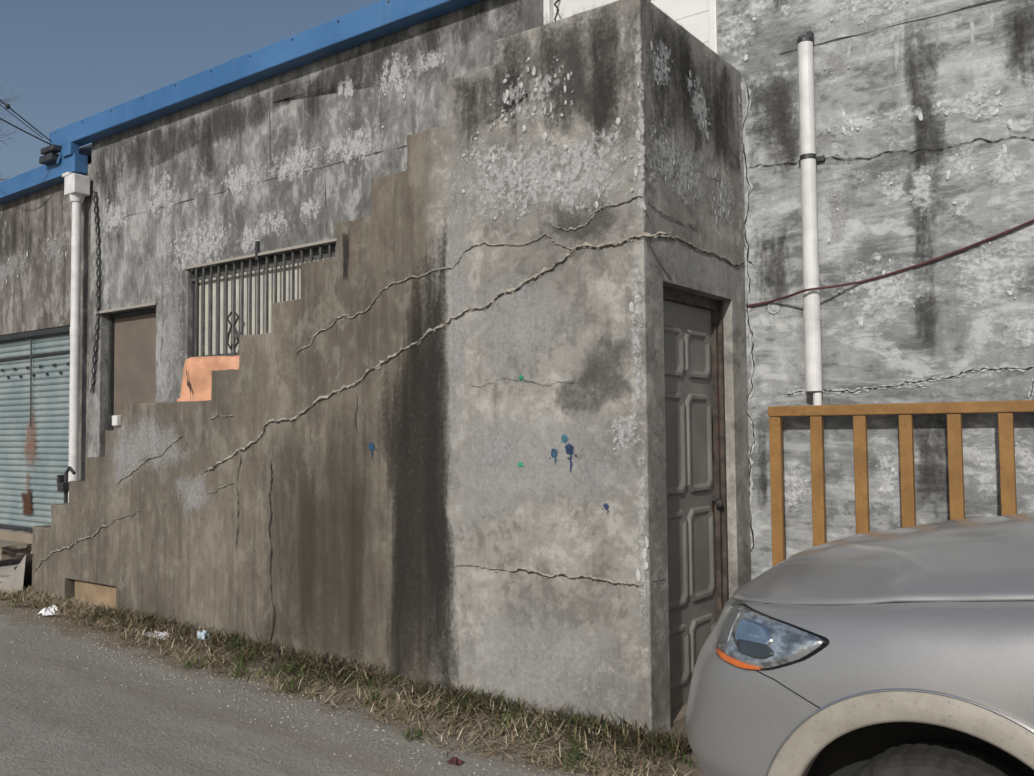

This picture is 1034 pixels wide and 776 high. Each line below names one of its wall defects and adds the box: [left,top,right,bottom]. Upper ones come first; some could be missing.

leakage [97,23,440,212]
leakage [454,24,625,146]
leakage [652,22,740,162]
leakage [846,17,974,175]
crack [825,136,1034,159]
leakage [555,206,607,238]
crack [204,77,797,644]
crack [785,364,1034,400]
rust [21,418,35,516]
crack [118,435,183,483]
leakage [383,219,464,684]
crack [34,510,139,571]